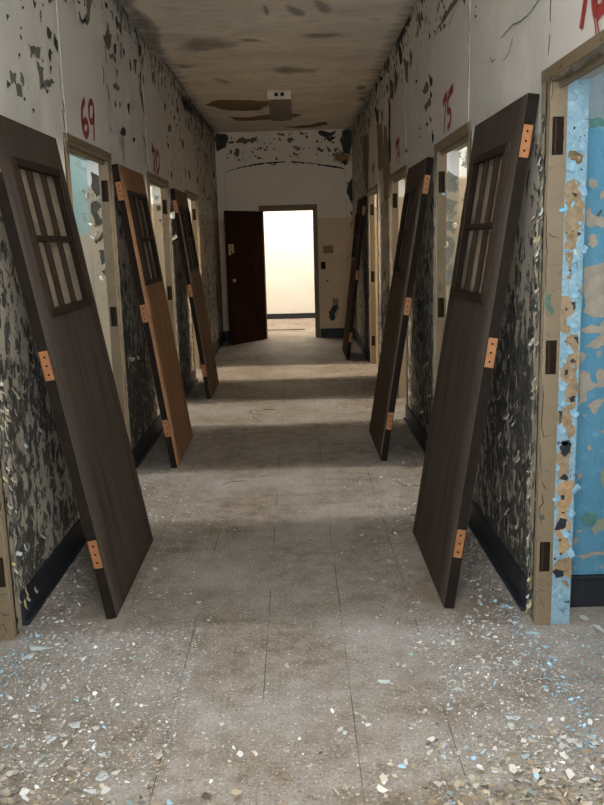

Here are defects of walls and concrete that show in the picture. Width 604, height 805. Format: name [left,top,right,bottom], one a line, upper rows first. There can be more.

peeling [7,70,26,101]
peeling [19,26,58,93]
peeling [65,0,95,25]
peeling [85,172,106,281]
flaking render [103,0,465,429]
peeling [0,341,604,805]